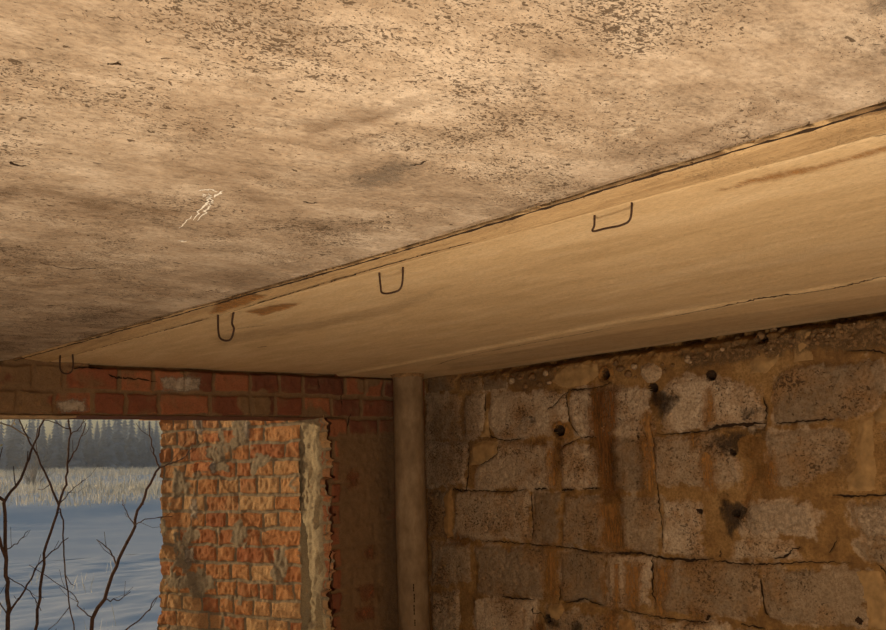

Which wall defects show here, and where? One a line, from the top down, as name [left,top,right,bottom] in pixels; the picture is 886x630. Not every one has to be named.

damp [745,166,824,183]
crack [14,106,886,382]
crack [546,382,610,447]
crack [453,395,849,629]
crack [837,492,886,500]